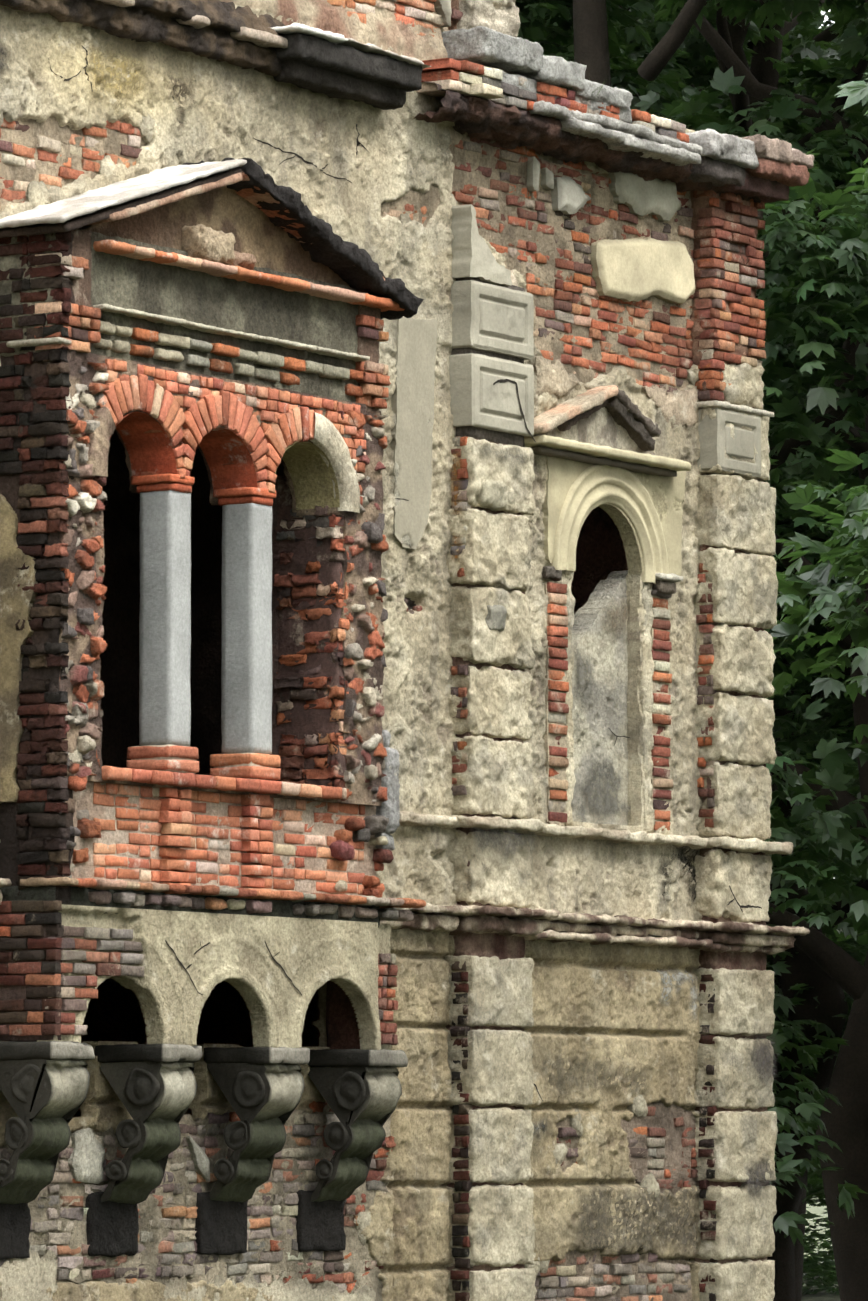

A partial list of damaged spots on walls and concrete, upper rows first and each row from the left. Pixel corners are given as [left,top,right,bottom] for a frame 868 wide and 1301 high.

peeling [434,0,452,27]
spalling [0,110,159,213]
crack [253,124,367,183]
spalling [381,126,766,429]
crack [165,940,210,995]
crack [265,941,302,996]